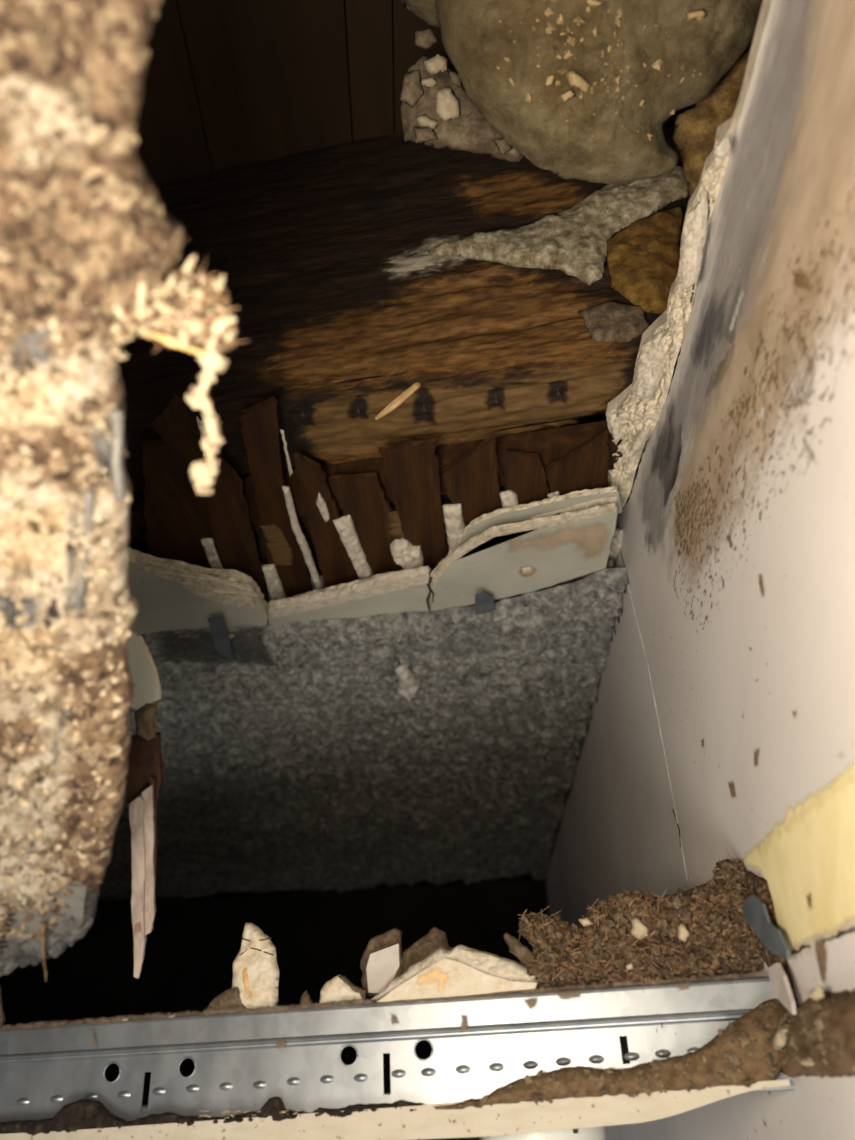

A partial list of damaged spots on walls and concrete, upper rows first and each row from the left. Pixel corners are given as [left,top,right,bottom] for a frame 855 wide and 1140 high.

damp [643,0,855,632]
flaking render [605,526,623,569]
spalling [159,628,274,666]
peeling [385,655,421,701]